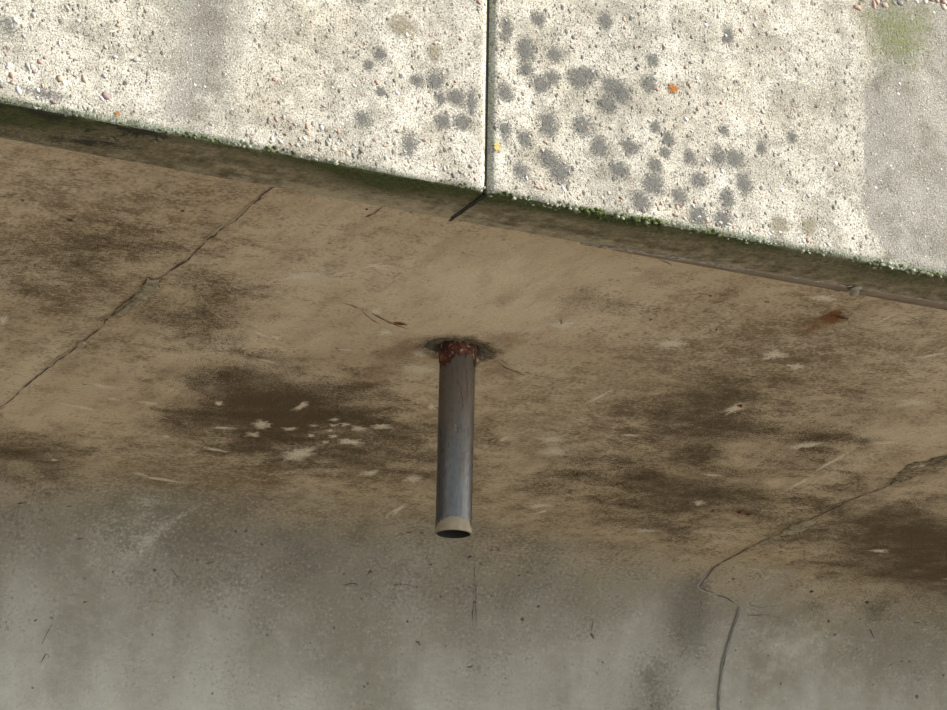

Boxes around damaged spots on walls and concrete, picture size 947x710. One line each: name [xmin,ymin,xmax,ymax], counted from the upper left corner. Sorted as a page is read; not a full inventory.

crack [157,187,275,280]
crack [0,294,135,409]
damp [0,186,438,497]
rust [439,340,477,372]
damp [435,516,472,537]
damp [473,337,947,657]
crack [697,534,780,710]